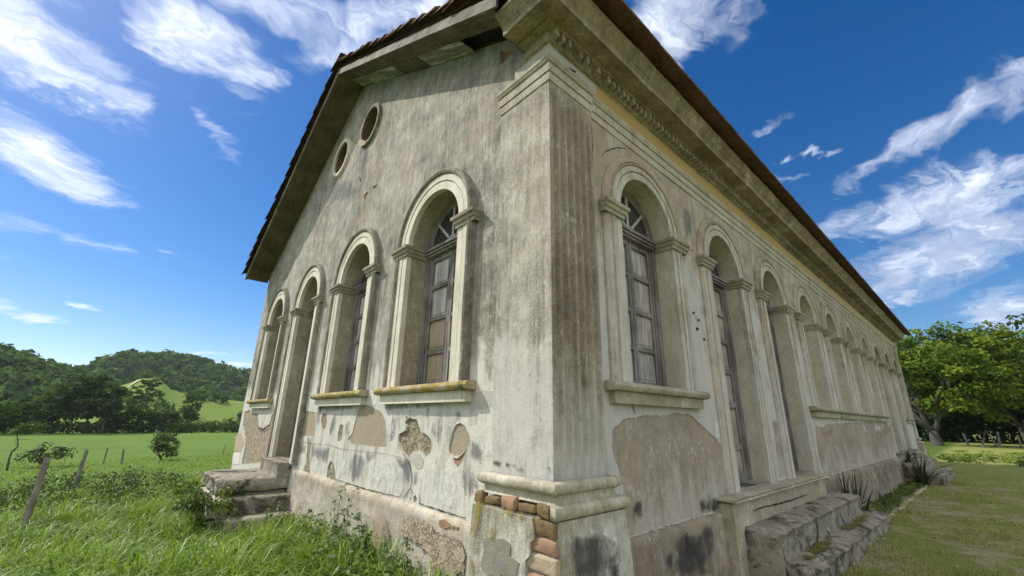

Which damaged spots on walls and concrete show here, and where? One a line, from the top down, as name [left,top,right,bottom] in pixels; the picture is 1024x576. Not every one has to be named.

spalling [232,410,274,465]
flaking render [338,405,432,458]
damp [299,447,477,510]
flaking render [449,423,470,468]
damp [471,440,522,471]
flaking render [612,412,726,537]
spalling [369,493,466,576]
flaking render [474,490,561,576]
damp [575,528,619,576]